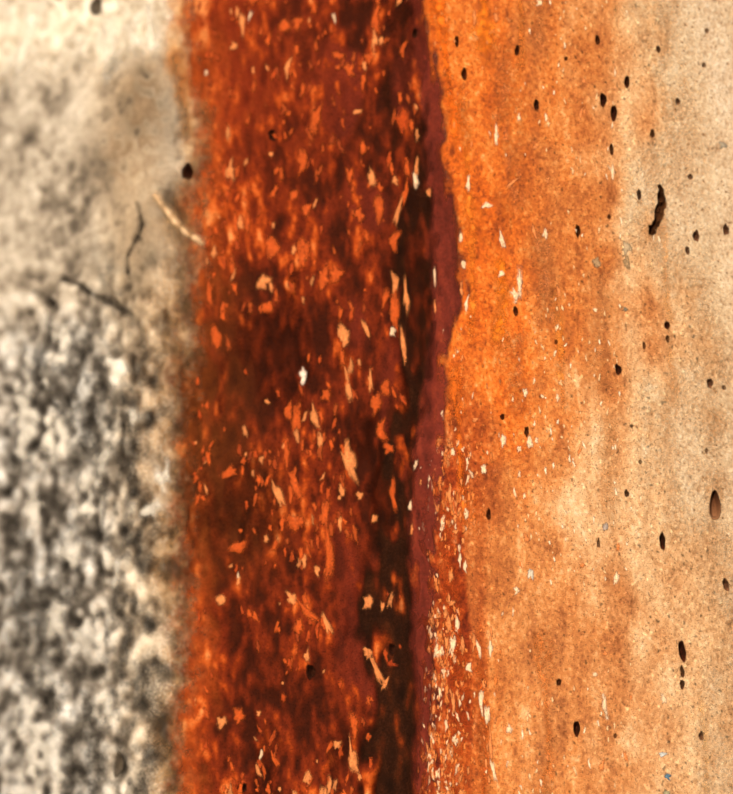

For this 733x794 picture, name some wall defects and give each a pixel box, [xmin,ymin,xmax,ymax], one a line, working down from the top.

rust [137,0,438,794]
rust [418,0,733,794]